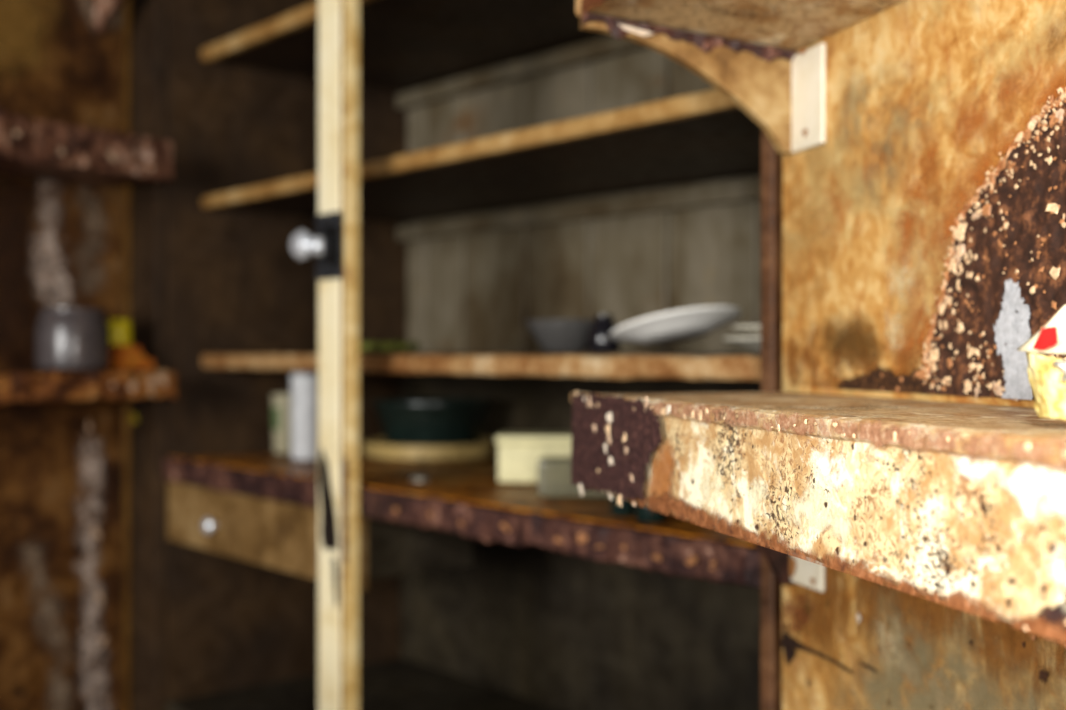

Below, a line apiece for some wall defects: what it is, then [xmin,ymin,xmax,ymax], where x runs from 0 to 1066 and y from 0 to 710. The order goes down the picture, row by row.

corrosion [836,74,1066,401]
corrosion [781,567,1066,691]